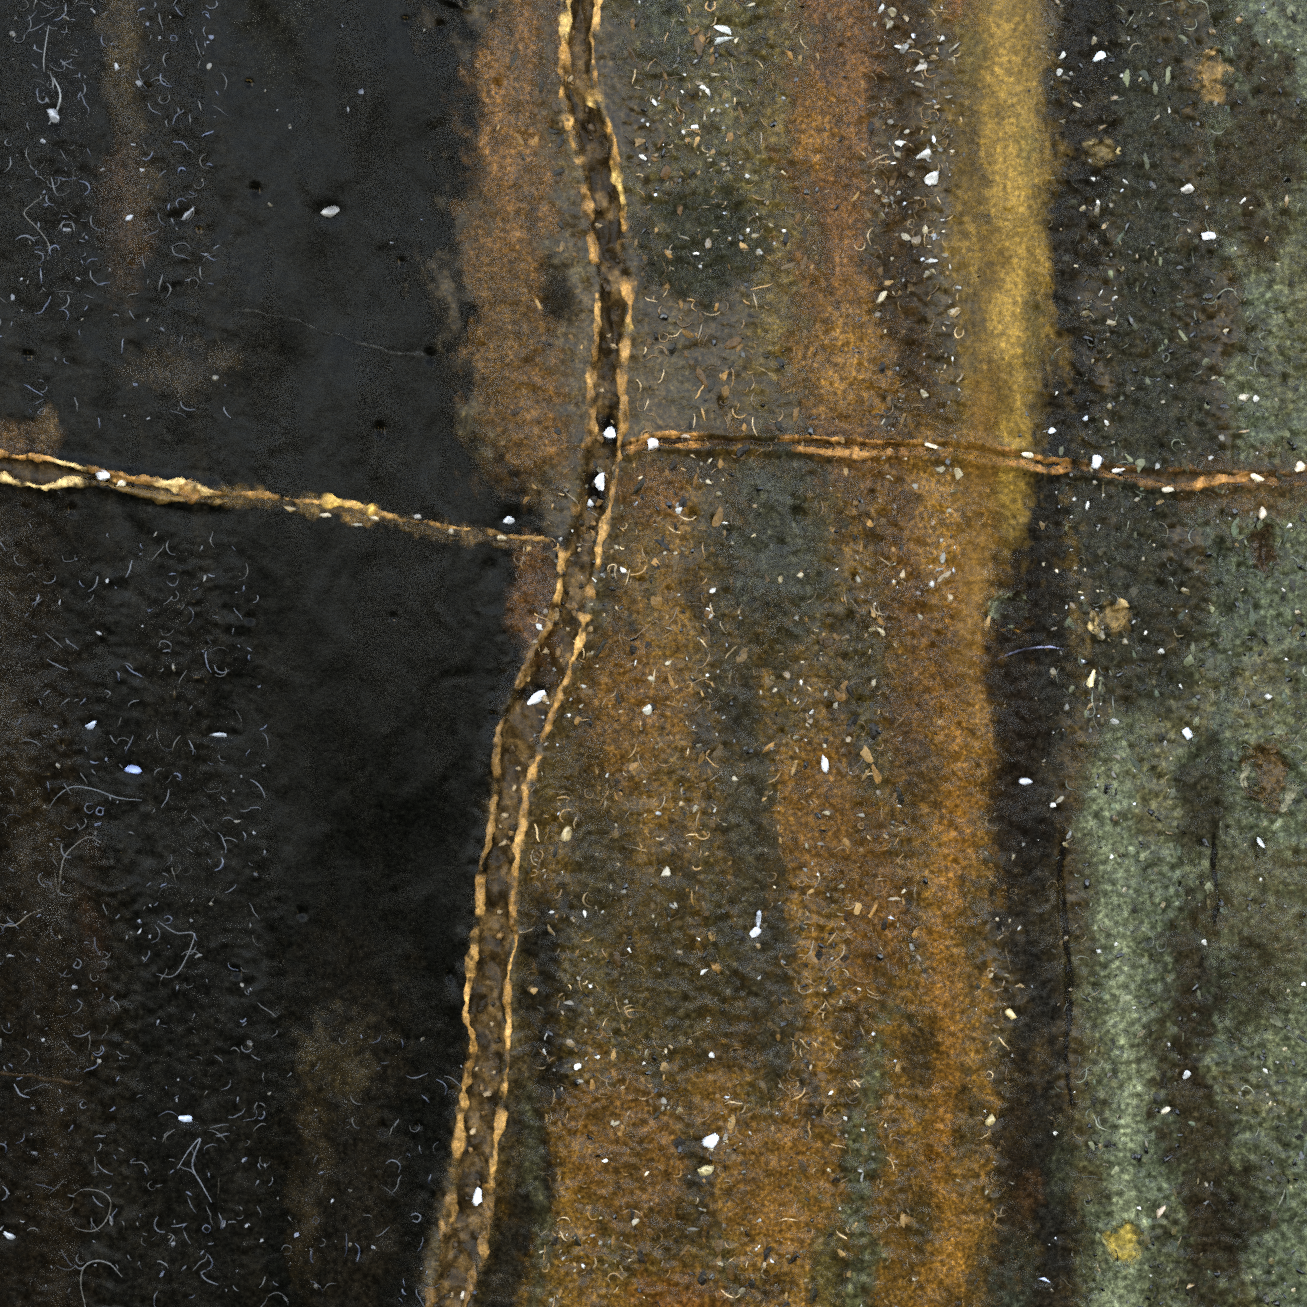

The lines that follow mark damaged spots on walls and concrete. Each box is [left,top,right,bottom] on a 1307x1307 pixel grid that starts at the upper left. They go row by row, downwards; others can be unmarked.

crack [0,449,548,548]
crack [244,309,422,357]
corrosion [461,0,584,503]
corrosion [496,0,1005,1307]
crack [425,0,1307,1307]
water stain [981,0,1307,1307]
crack [0,1072,71,1084]